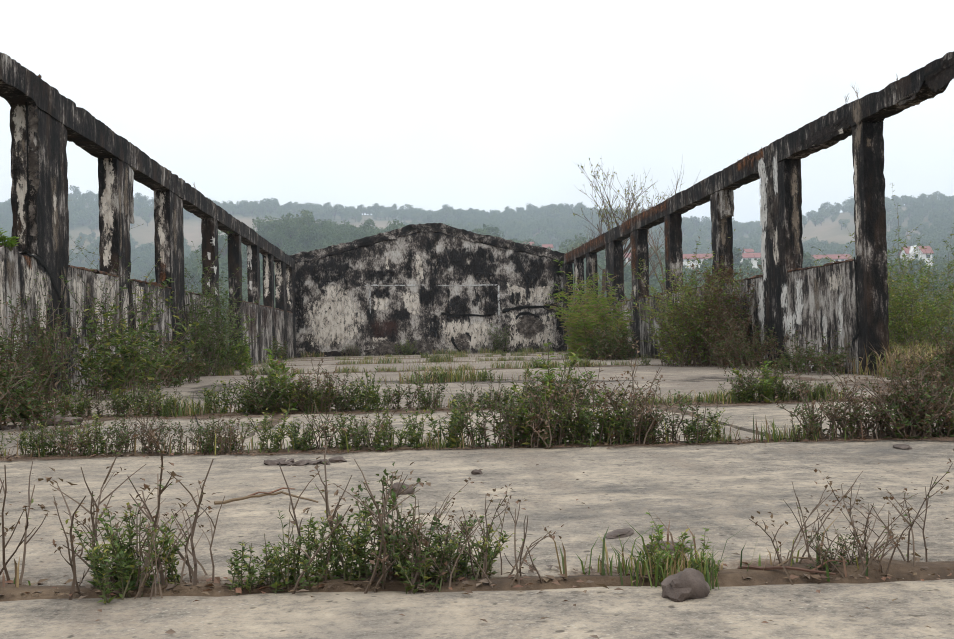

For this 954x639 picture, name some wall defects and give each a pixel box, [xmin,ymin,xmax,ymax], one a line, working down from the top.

flaking render [0,102,50,349]
leakage [51,179,59,250]
peeling [71,158,143,354]
leakage [295,252,355,333]
leakage [368,270,394,299]
leakage [394,308,410,322]
leakage [419,247,562,338]
peeling [750,154,785,335]
peeling [781,270,852,369]